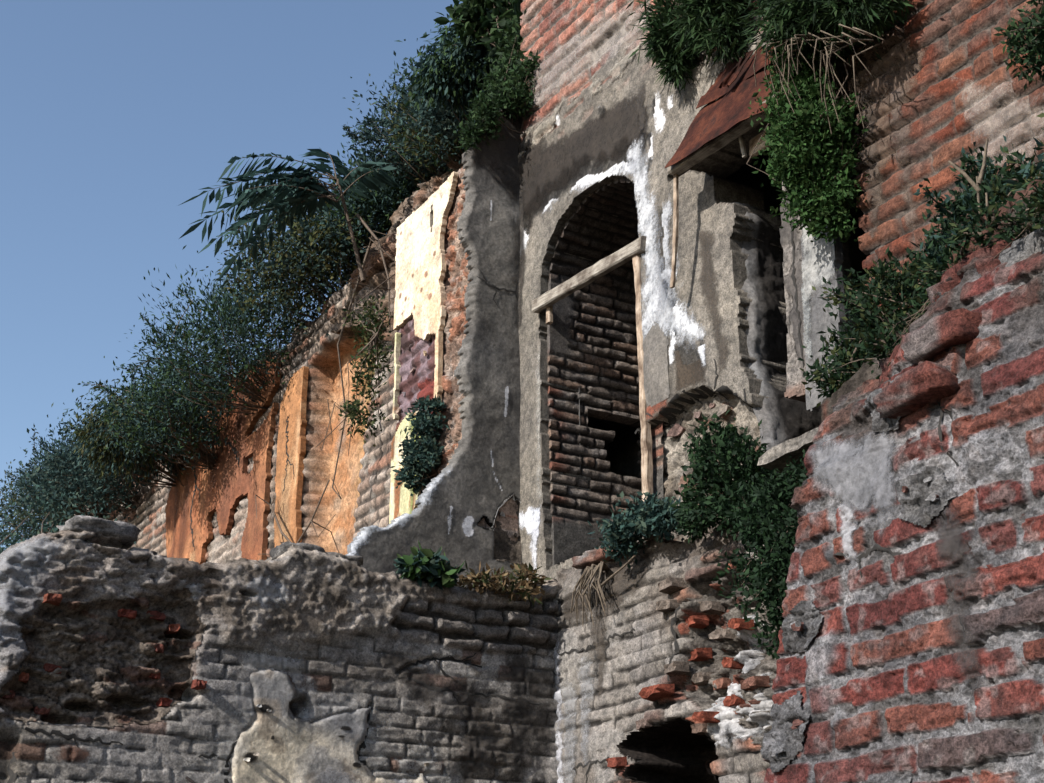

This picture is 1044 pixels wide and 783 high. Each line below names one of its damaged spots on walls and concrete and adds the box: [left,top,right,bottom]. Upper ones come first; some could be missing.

damp [473,11,727,390]
crack [477,268,517,308]
spalling [207,497,248,563]
crack [24,727,123,747]
spalling [0,587,207,728]
flaking render [229,668,430,783]
crack [398,653,542,705]
spalling [639,570,824,773]